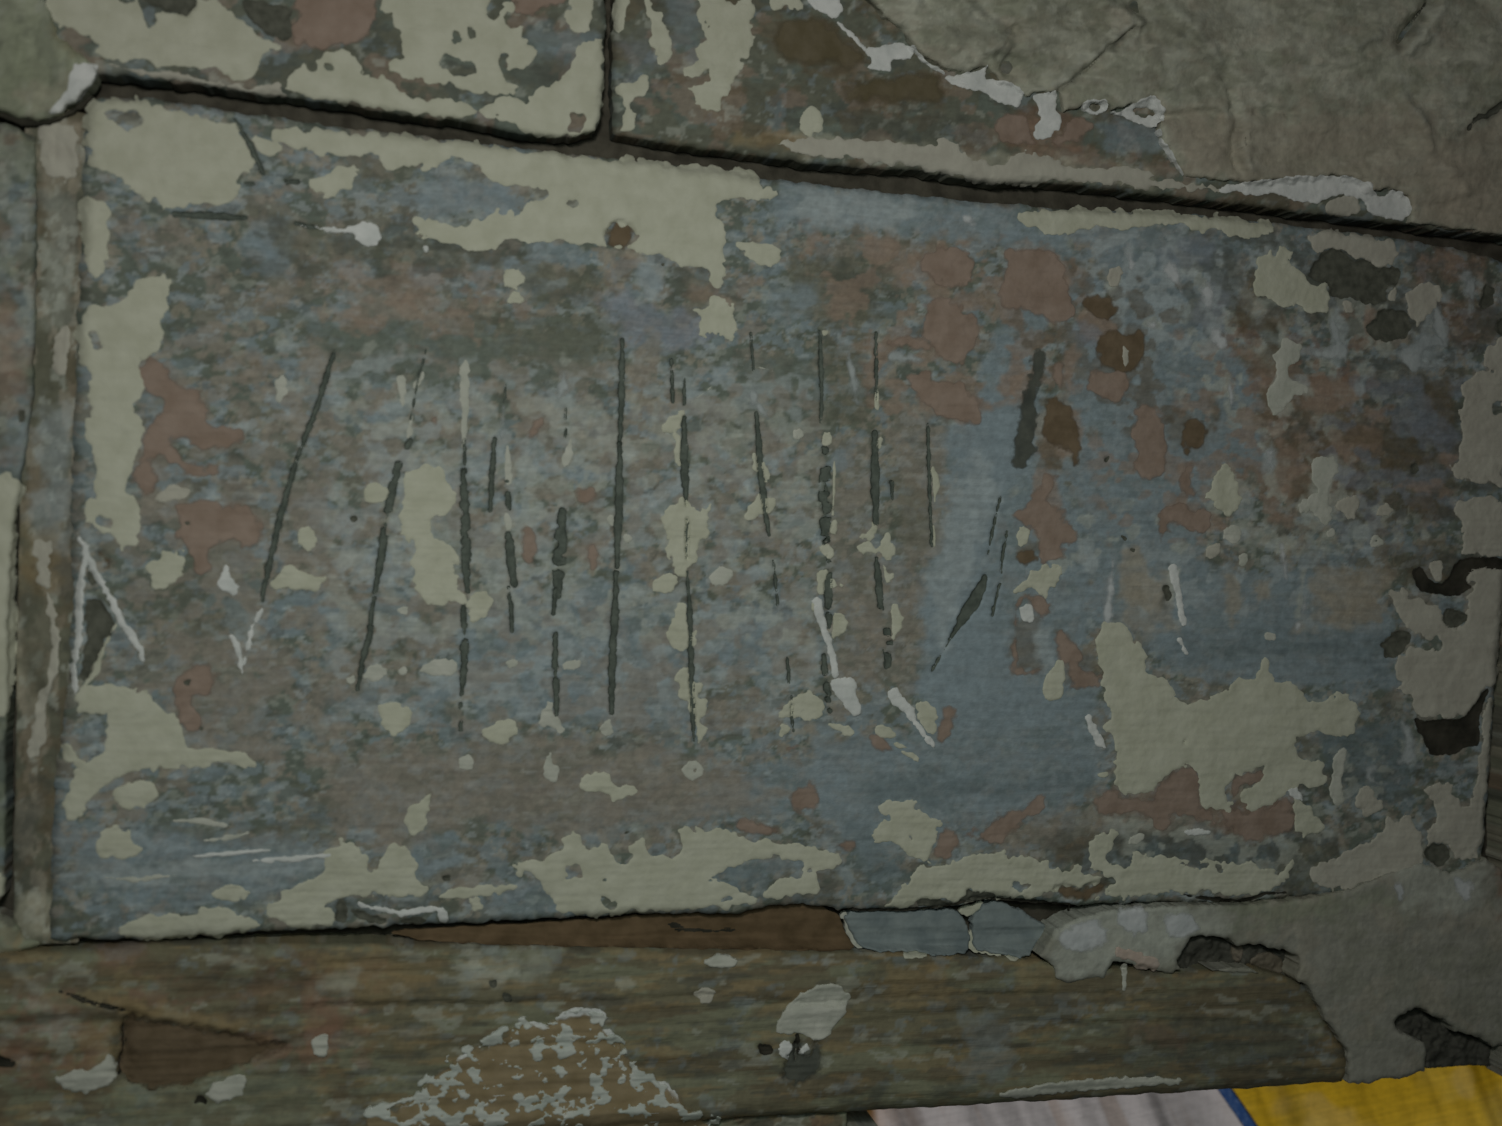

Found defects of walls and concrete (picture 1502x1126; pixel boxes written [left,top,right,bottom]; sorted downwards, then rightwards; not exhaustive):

peeling [38,0,803,341]
peeling [778,106,1219,193]
peeling [1017,196,1448,372]
peeling [52,274,190,564]
peeling [0,472,257,860]
peeling [119,284,1502,968]
peeling [55,1054,118,1094]
peeling [194,1074,247,1104]
peeling [311,1034,329,1057]
peeling [694,987,716,1004]
spalling [1177,935,1286,975]
spalling [1394,1008,1491,1068]